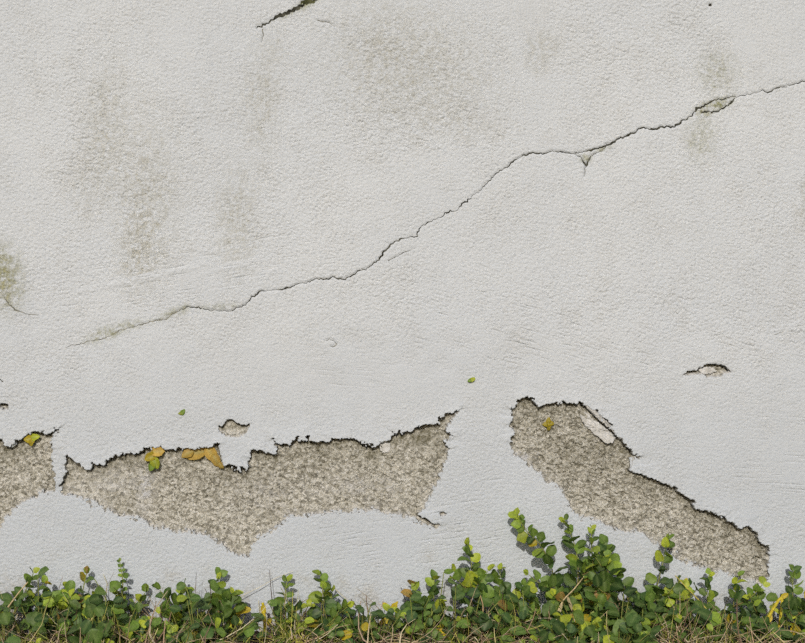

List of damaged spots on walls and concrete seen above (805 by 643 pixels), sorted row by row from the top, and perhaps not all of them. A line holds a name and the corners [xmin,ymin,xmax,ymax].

crack [257,0,335,39]
crack [68,80,805,347]
spalling [683,364,731,378]
spalling [0,410,460,557]
spalling [509,396,770,586]